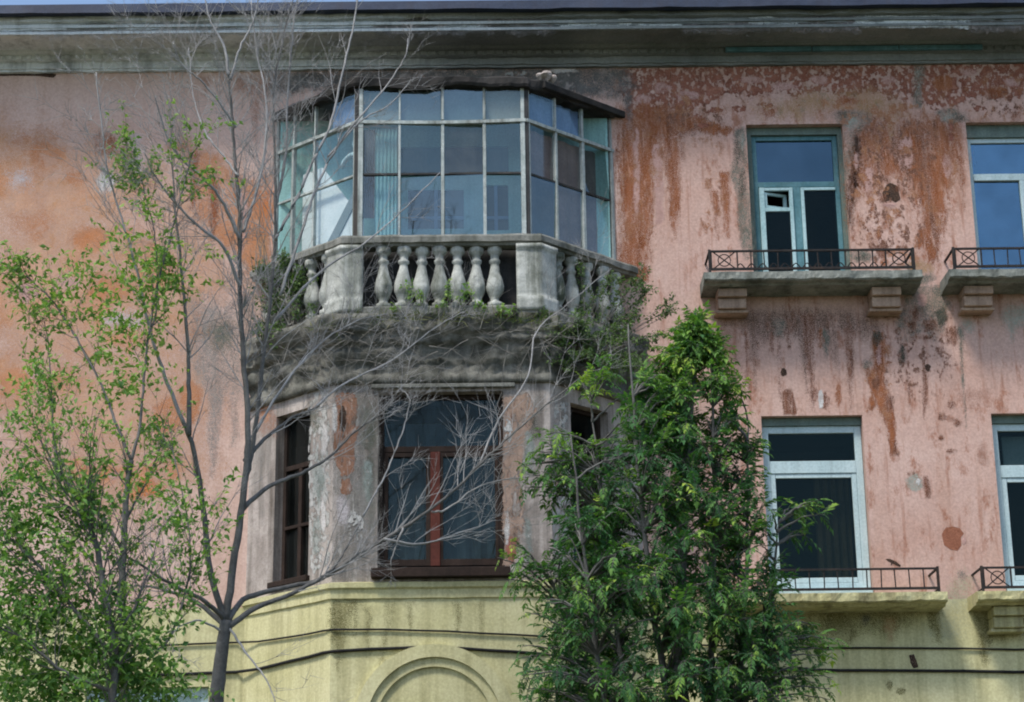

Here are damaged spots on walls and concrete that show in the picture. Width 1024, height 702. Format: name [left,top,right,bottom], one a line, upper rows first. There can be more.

leakage [730,126,757,261]
peeling [611,63,1024,284]
peeling [308,389,378,574]
peeling [500,392,540,566]
flaking render [942,527,967,551]